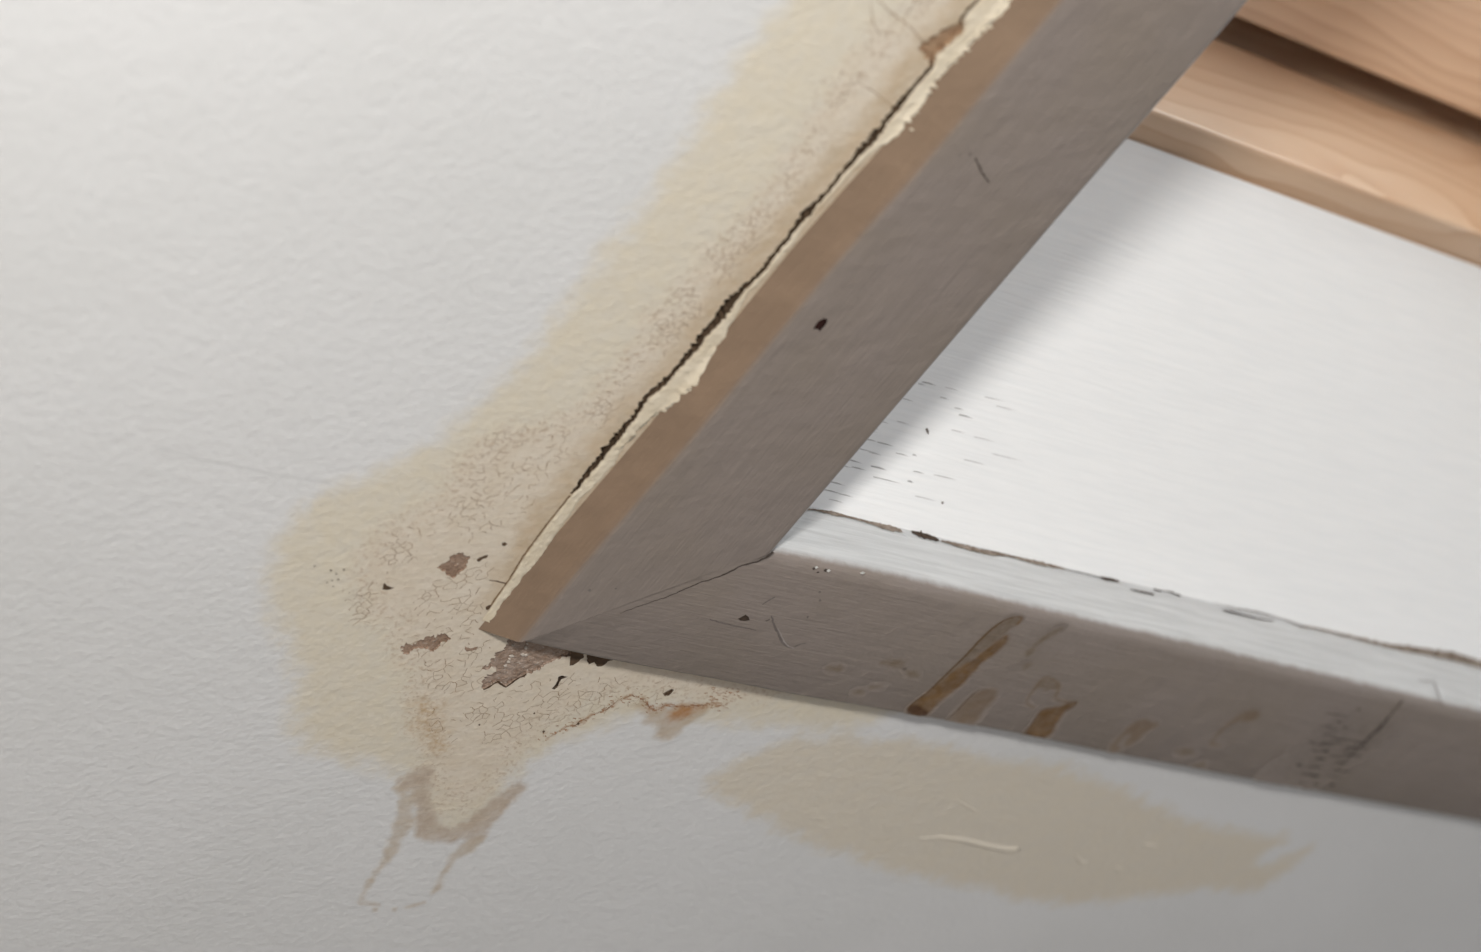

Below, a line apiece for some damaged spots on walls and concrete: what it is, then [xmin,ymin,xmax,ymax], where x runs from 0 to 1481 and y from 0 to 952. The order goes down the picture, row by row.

peeling [437,542,507,578]
peeling [400,633,613,690]
crack [342,0,934,748]
peeling [482,0,1010,623]
leakage [238,0,1328,915]
crack [959,0,979,23]